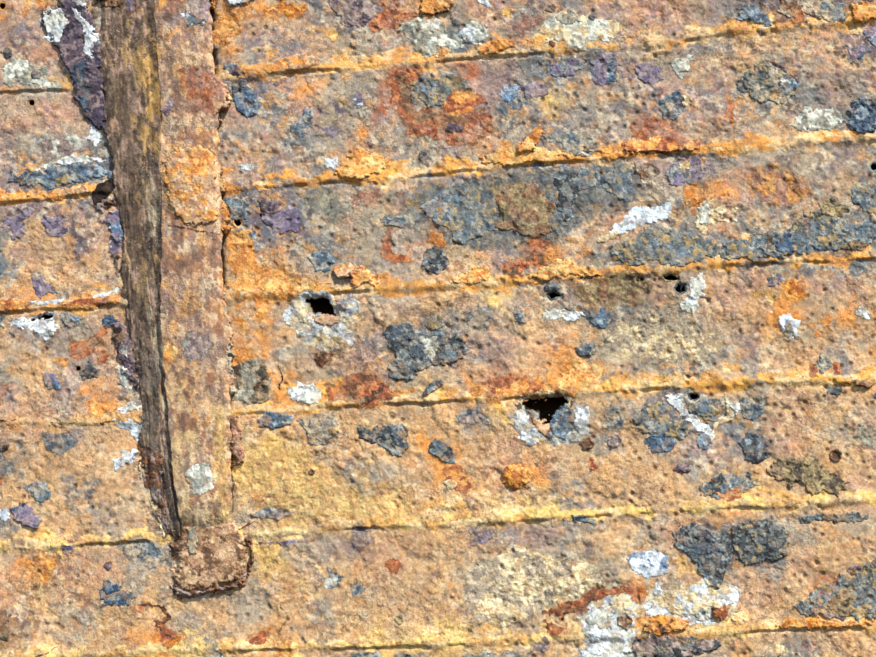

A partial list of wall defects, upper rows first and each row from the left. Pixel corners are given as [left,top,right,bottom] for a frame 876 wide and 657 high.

peeling [39,0,100,59]
corrosion [386,63,494,146]
corrosion [479,124,571,168]
corrosion [599,111,701,161]
corrosion [334,148,391,207]
corrosion [160,144,322,398]
corrosion [452,183,655,307]
corrosion [0,287,122,315]
corrosion [470,357,604,405]
corrosion [0,480,52,529]
corrosion [138,445,169,537]
corrosion [766,452,851,498]